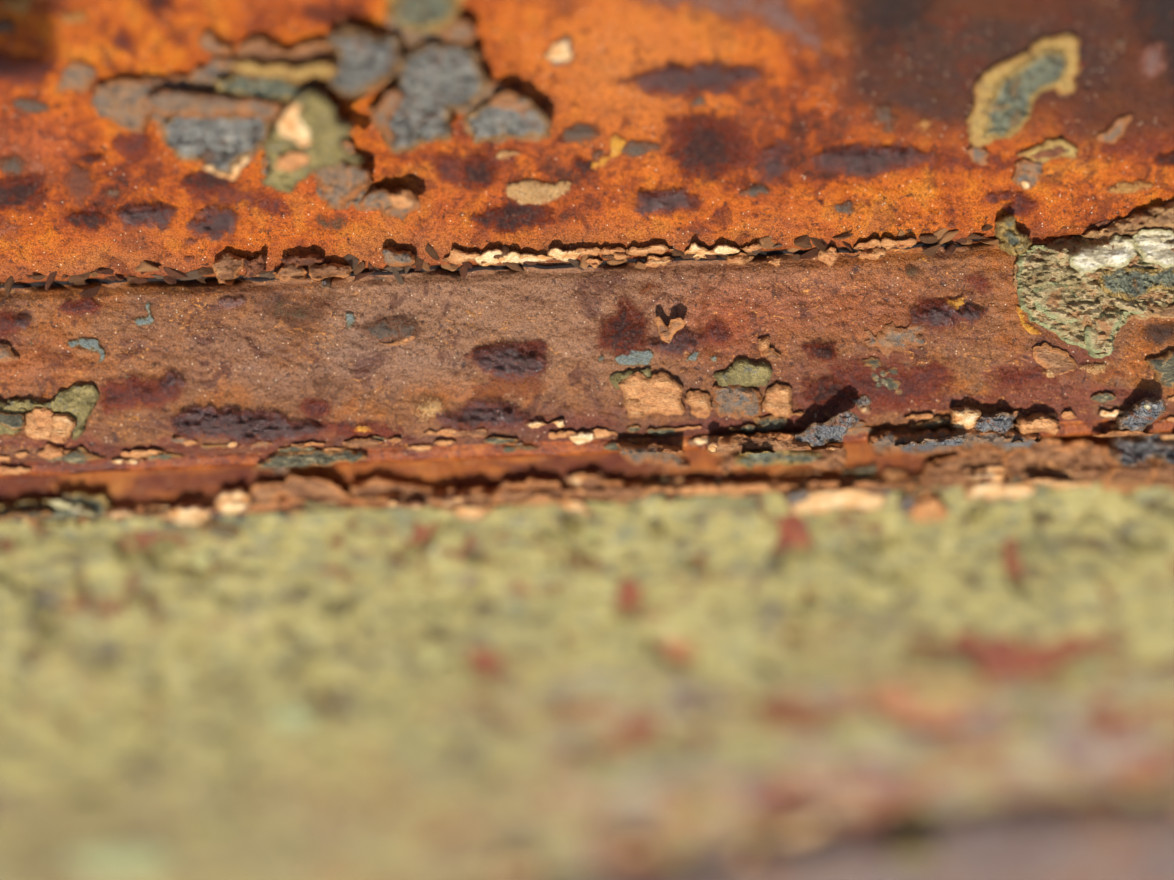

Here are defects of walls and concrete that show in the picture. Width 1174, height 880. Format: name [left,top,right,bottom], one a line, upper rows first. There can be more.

corrosion [212,253,353,285]
peeling [59,0,603,263]
corrosion [506,180,572,205]
corrosion [444,242,783,269]
spalling [618,60,762,216]
corrosion [853,237,917,260]
corrosion [829,274,1061,435]
peeling [965,35,1086,147]
corrosion [994,201,1174,290]
peeling [1015,229,1174,375]
peeling [0,358,877,475]
peeling [1090,393,1174,431]